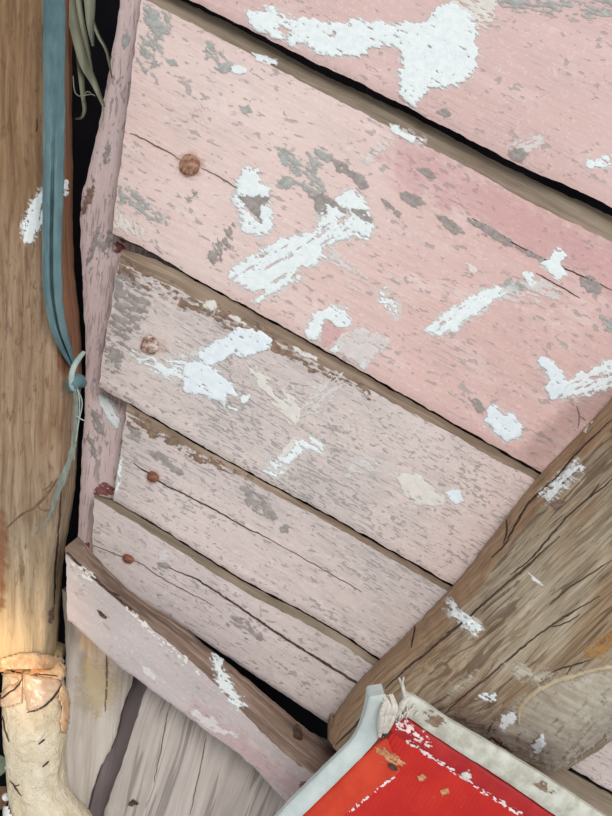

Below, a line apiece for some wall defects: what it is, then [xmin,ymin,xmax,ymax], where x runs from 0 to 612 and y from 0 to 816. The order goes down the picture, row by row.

crack [130,133,180,160]
peeling [237,194,270,223]
peeling [268,146,373,223]
peeling [104,260,371,400]
crack [93,545,357,683]
crack [134,463,361,592]
crack [385,479,612,689]
crack [436,560,612,714]
crack [336,719,360,745]
crack [488,722,521,752]